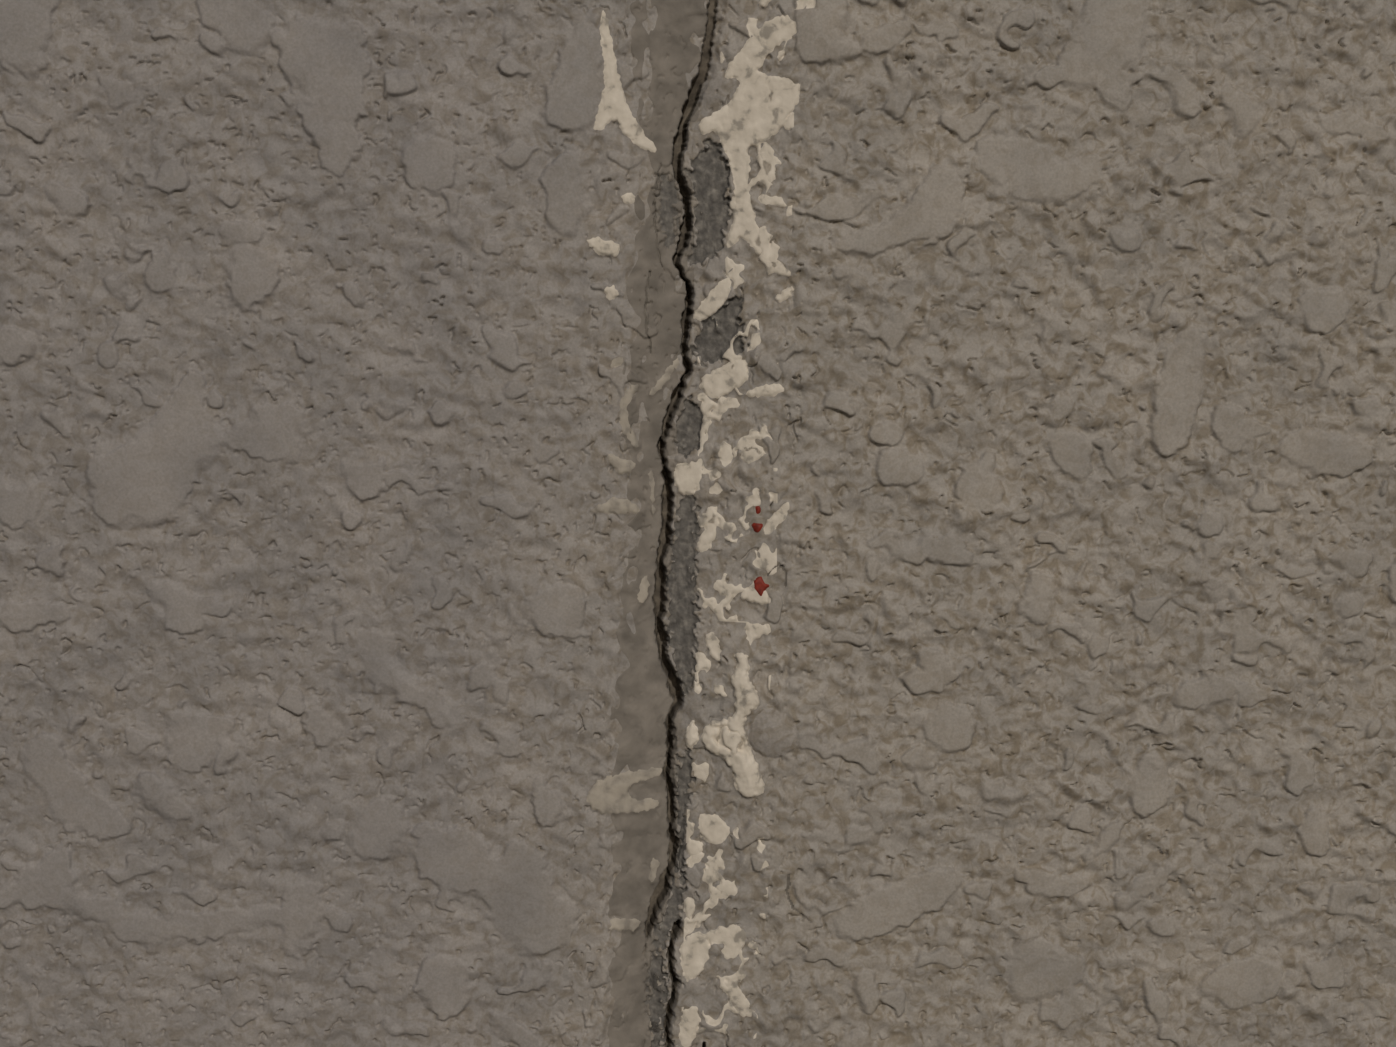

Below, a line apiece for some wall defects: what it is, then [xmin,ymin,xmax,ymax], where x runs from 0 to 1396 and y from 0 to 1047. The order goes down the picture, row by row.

crack [642,0,717,1047]
peeling [586,0,816,1047]